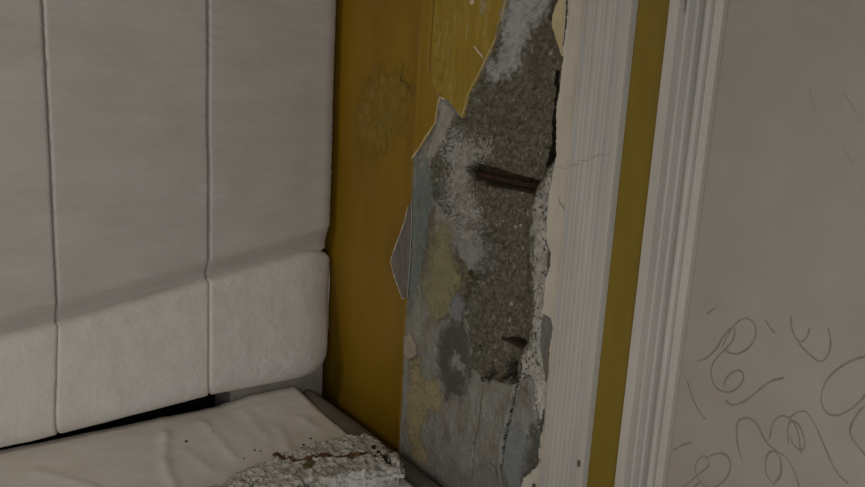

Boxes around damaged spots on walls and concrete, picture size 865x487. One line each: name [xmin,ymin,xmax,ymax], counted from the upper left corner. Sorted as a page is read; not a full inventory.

corrosion [467,164,540,193]
spalling [390,0,568,487]
crack [471,366,522,487]